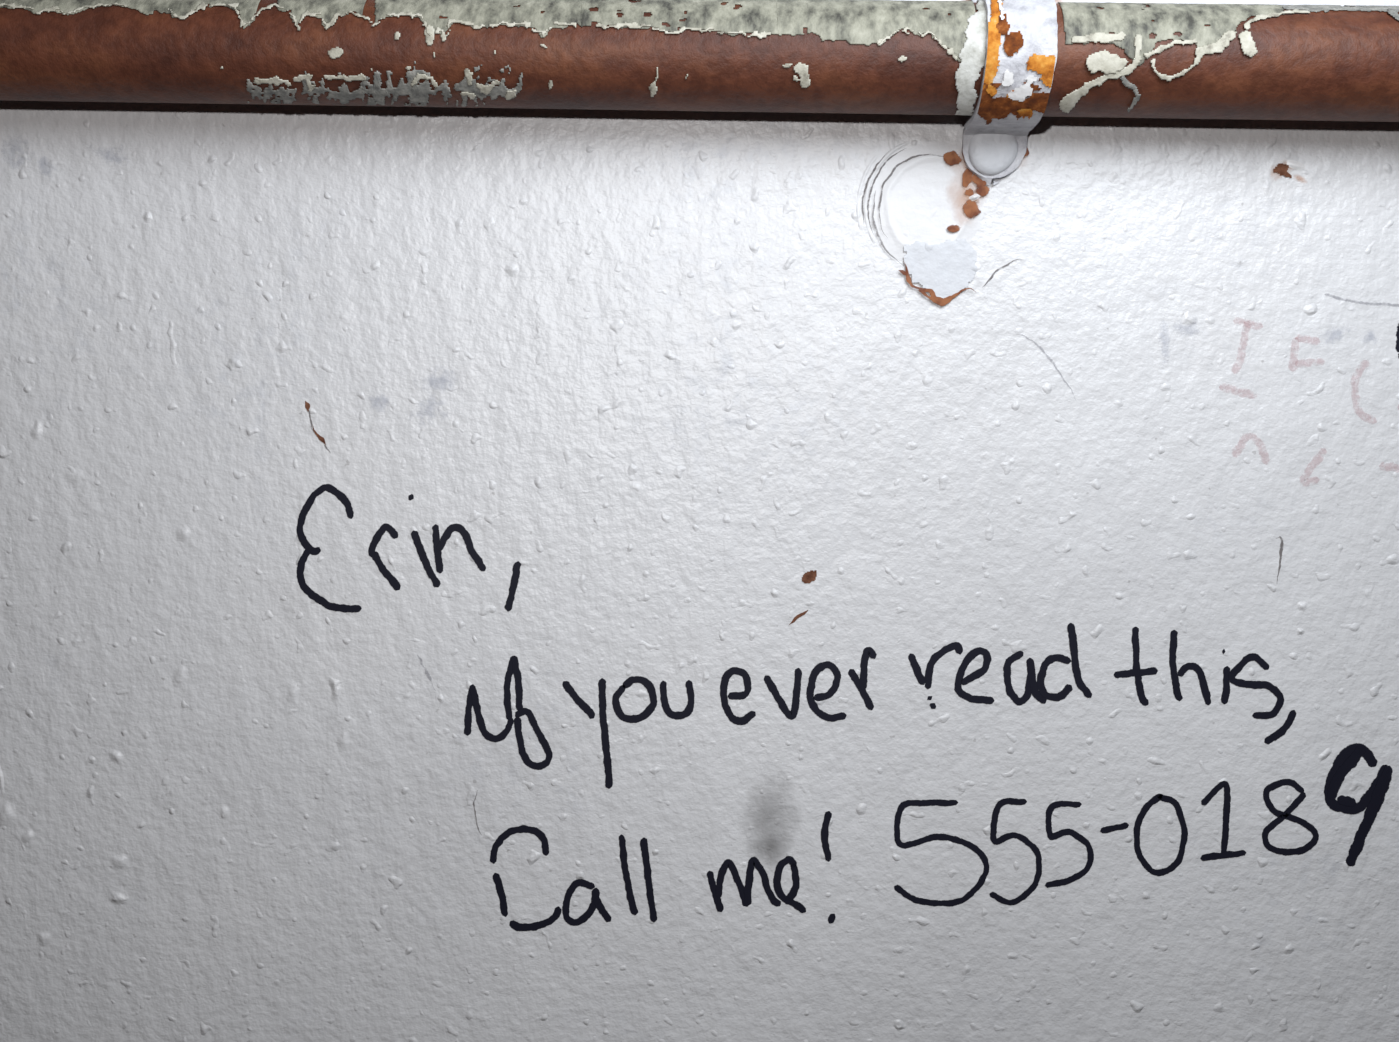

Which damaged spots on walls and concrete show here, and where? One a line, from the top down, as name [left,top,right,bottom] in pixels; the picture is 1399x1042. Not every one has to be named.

corrosion [977,0,1056,125]
corrosion [943,151,989,232]
peeling [898,239,1023,306]